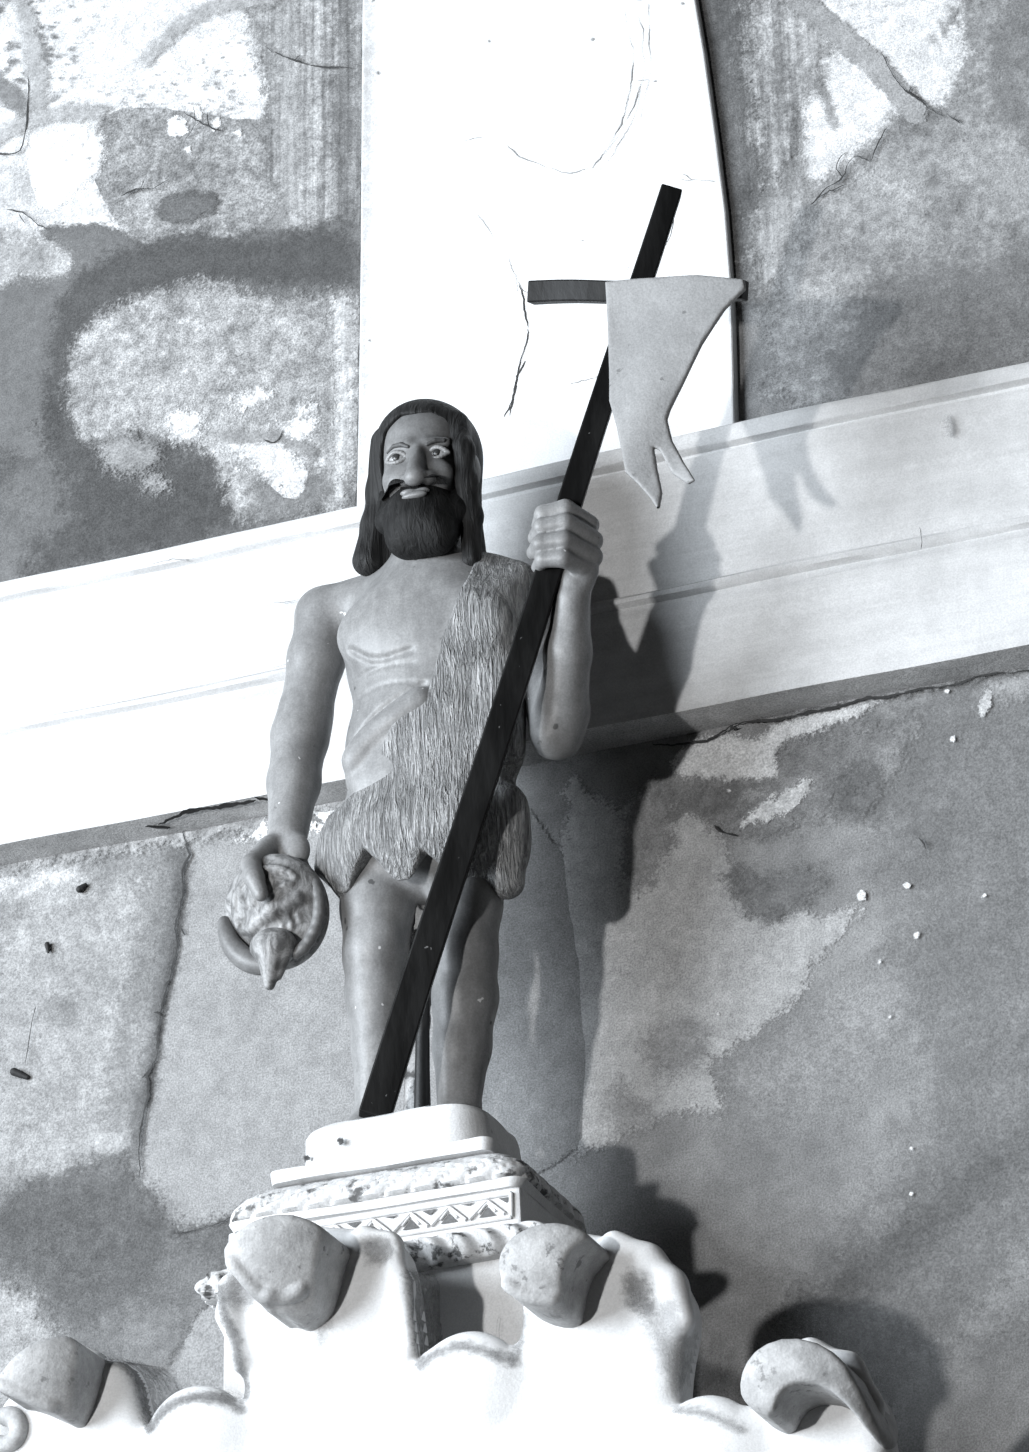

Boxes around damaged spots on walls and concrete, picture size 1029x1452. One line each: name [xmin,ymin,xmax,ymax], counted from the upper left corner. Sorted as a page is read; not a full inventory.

crack [811,128,887,205]
crack [882,54,961,124]
damp [0,0,361,582]
crack [653,670,1029,746]
crack [129,797,268,1176]
damp [689,684,1029,1405]
damp [0,1150,233,1379]